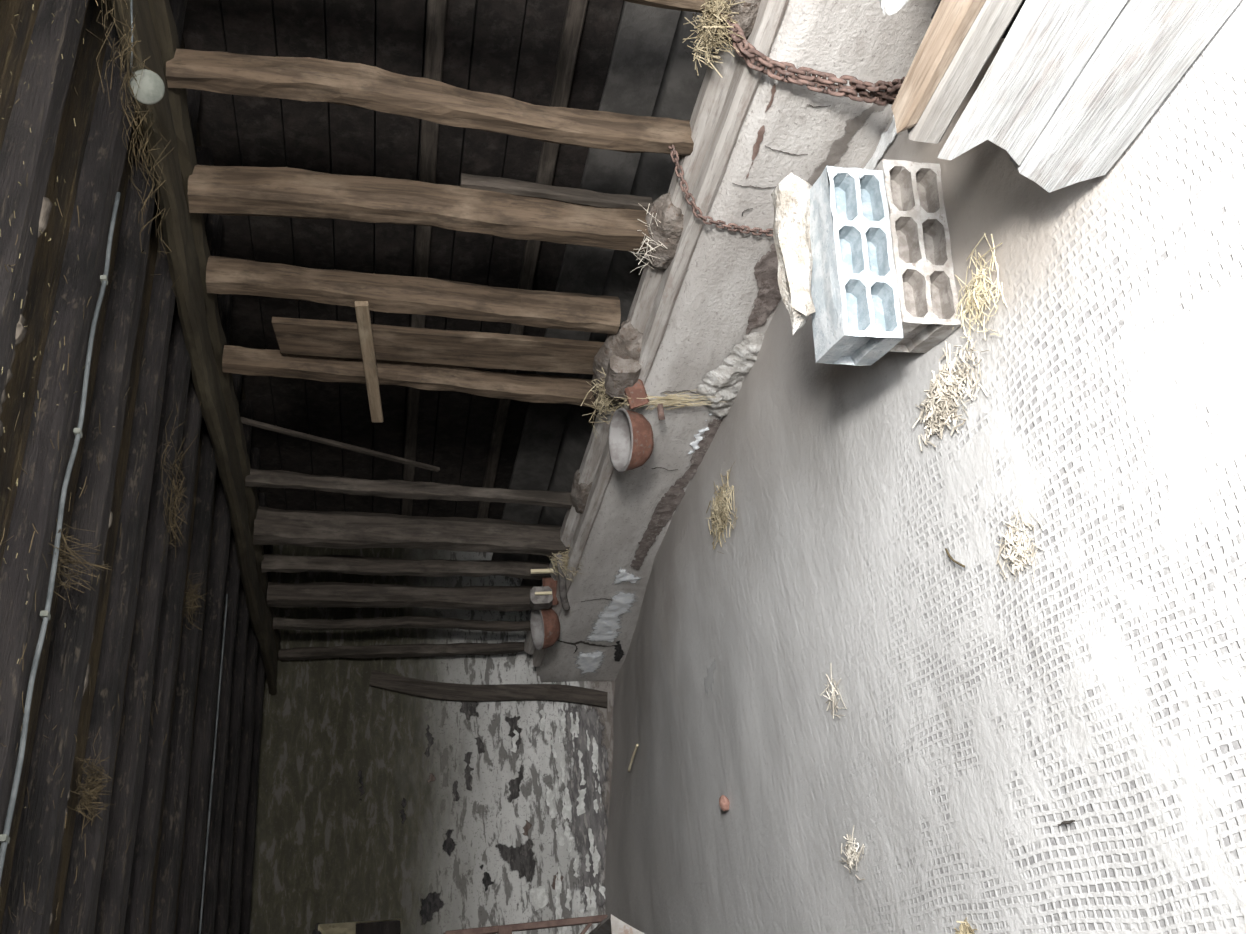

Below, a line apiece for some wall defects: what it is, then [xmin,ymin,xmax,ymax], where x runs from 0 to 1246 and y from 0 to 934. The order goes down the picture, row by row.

spalling [630,419,722,570]
spalling [614,641,624,661]
peeling [460,701,479,720]
peeling [453,737,485,801]
peeling [495,702,609,934]
peeling [442,829,456,856]
peeling [480,865,494,891]
peeling [420,892,444,925]